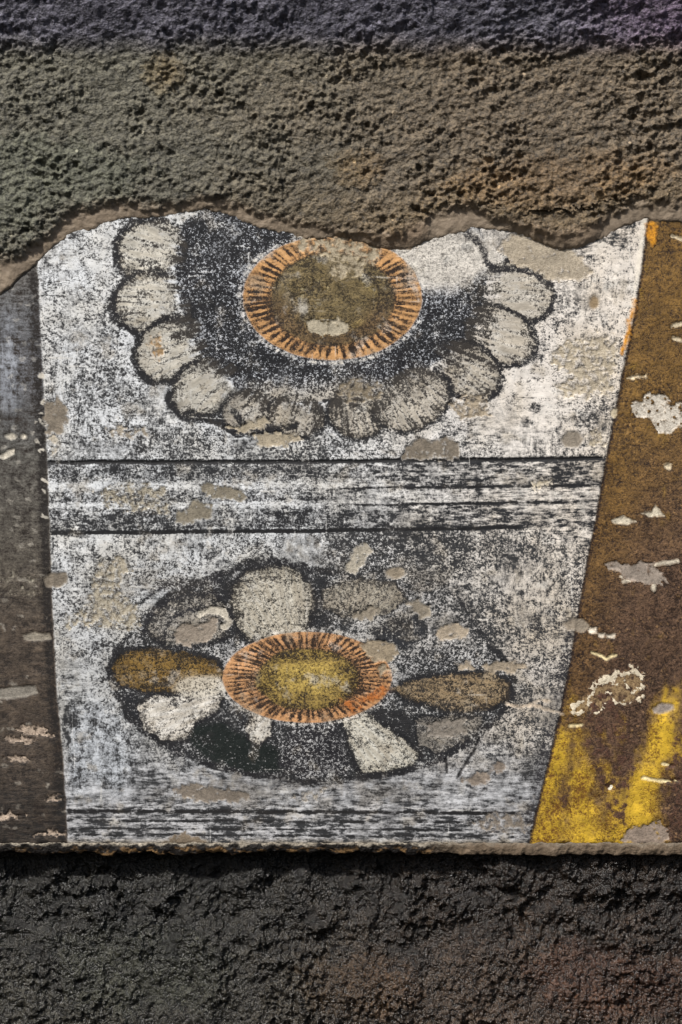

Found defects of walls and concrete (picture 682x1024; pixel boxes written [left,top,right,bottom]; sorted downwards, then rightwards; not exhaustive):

flaking render [670,321,682,343]
peeling [546,329,682,450]
peeling [605,558,680,593]
peeling [567,650,676,728]
flaking render [640,761,677,784]